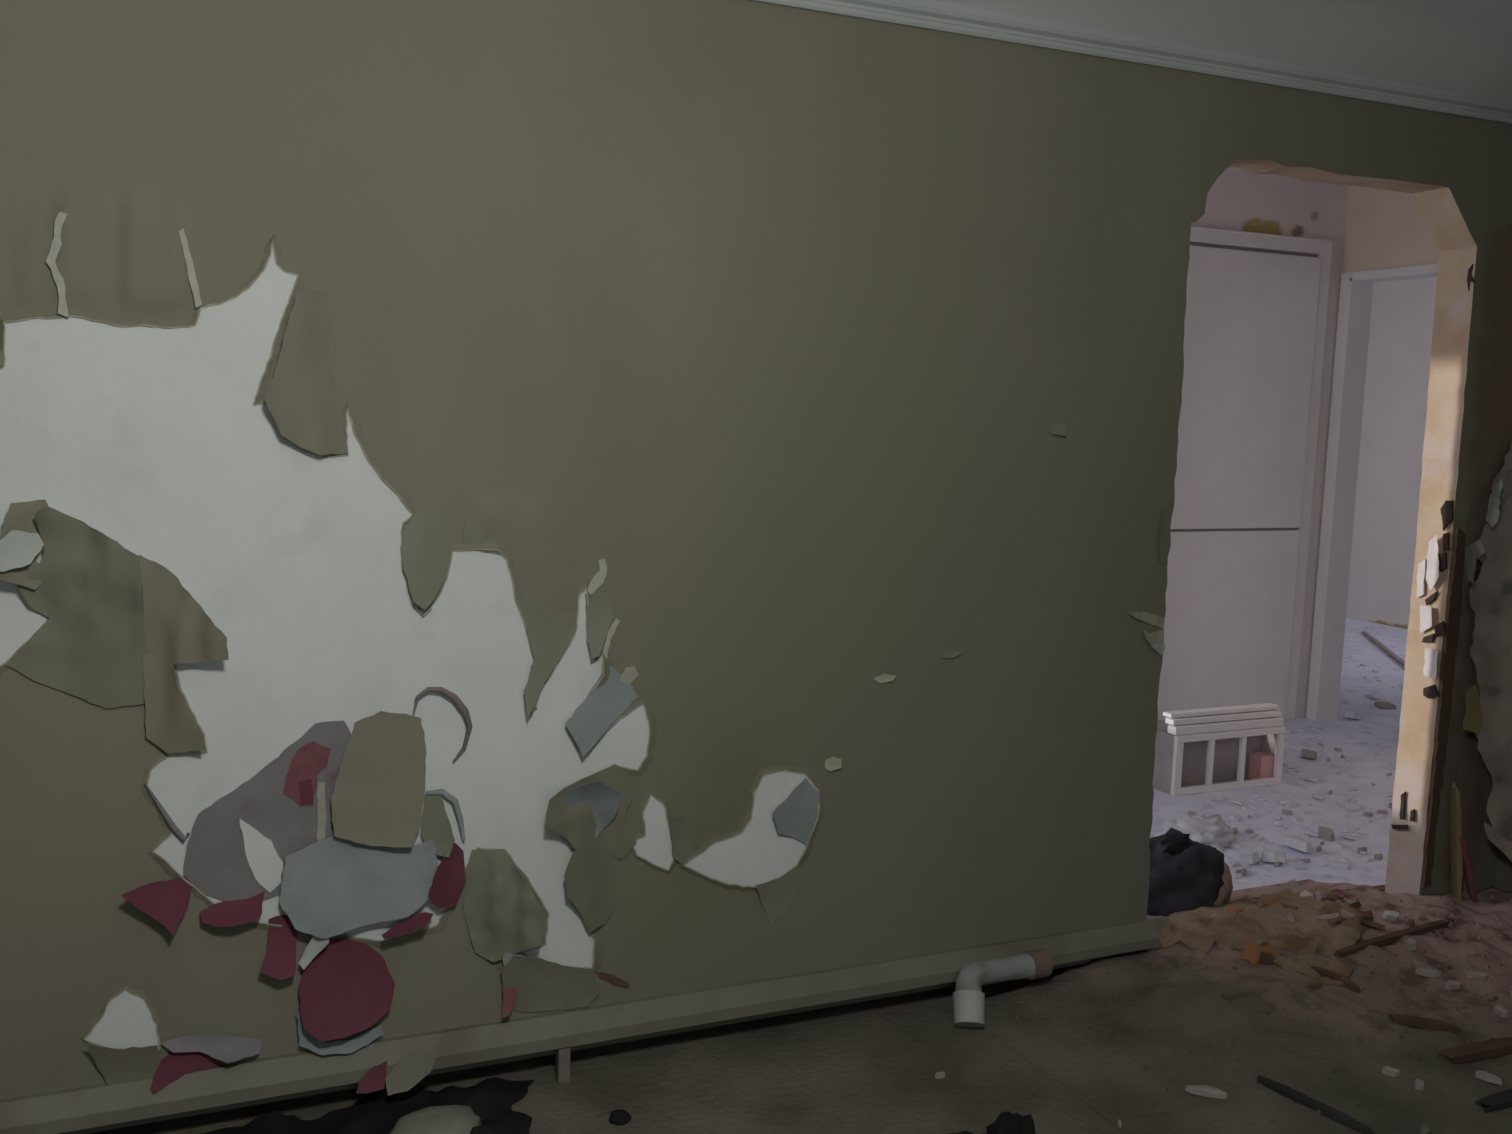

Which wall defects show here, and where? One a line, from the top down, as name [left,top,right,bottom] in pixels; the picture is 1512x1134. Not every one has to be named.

peeling [0,212,842,1055]
peeling [1391,442,1512,888]
peeling [80,986,262,1094]